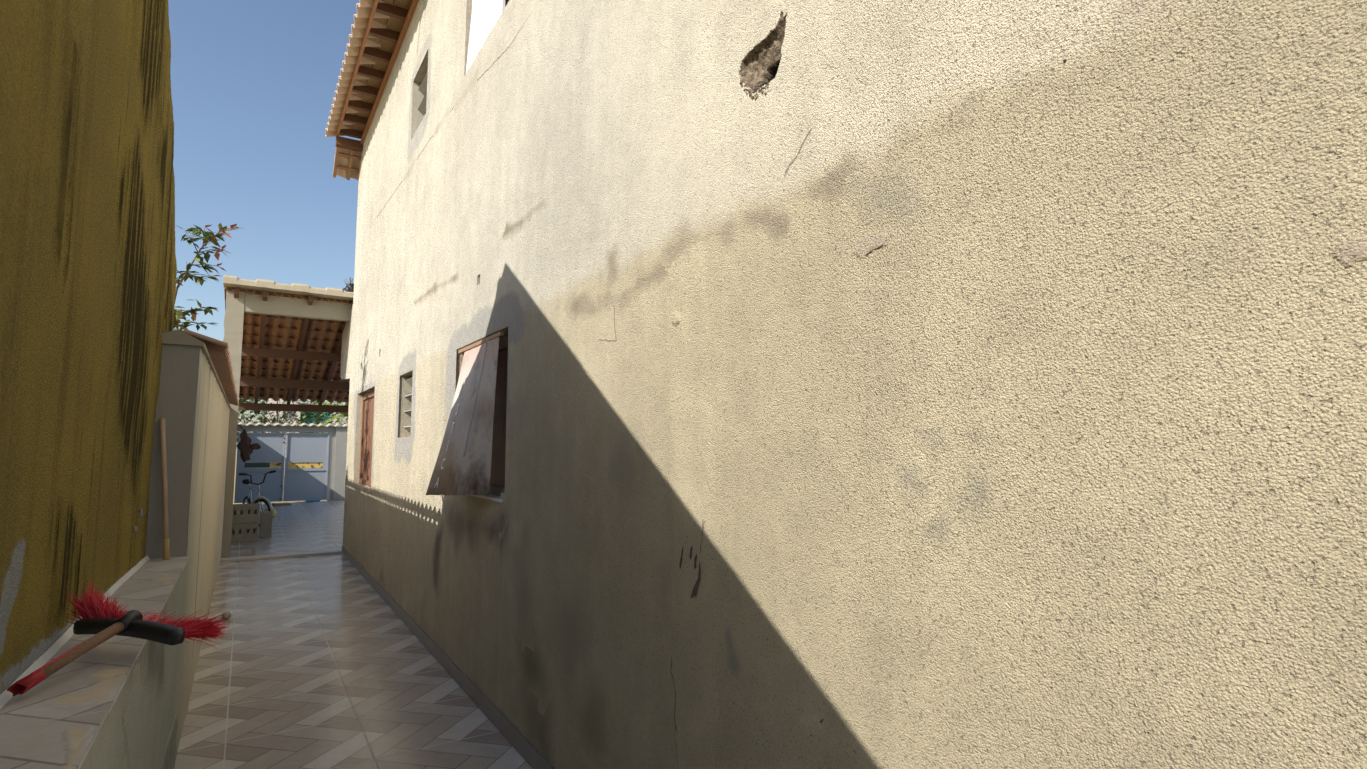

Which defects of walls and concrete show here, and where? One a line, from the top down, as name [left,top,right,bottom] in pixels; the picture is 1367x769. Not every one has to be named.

spalling [726,0,802,133]
water stain [555,82,991,325]
peeling [0,535,26,659]